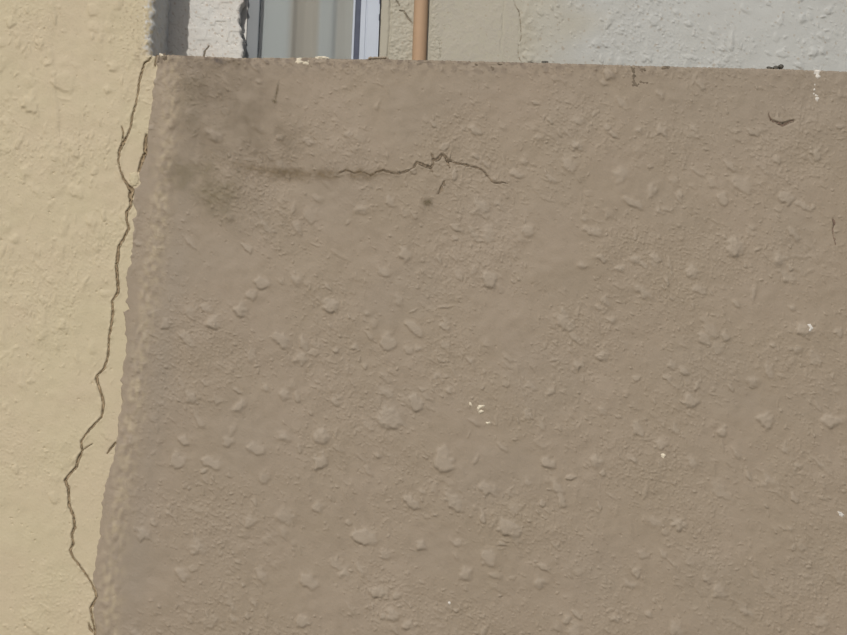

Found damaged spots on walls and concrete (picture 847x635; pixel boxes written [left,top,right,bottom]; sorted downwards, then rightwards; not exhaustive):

crack [64,55,157,635]
crack [340,151,505,194]